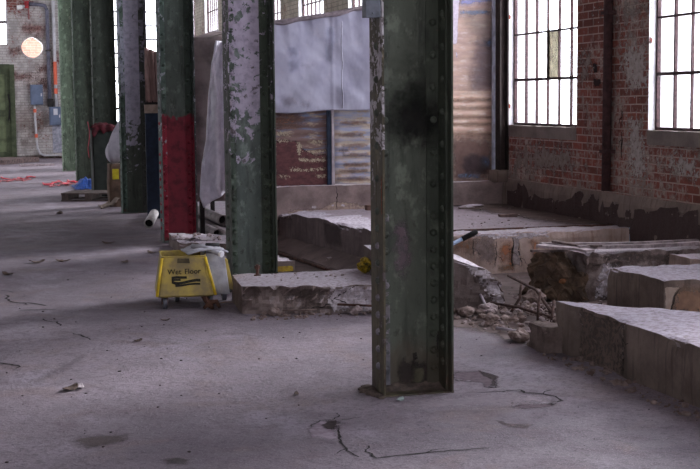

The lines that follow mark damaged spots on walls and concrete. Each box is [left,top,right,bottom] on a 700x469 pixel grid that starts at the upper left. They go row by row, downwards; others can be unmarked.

crack [1,290,91,340]
spalling [327,285,372,312]
spalling [468,236,555,322]
crack [310,413,480,458]